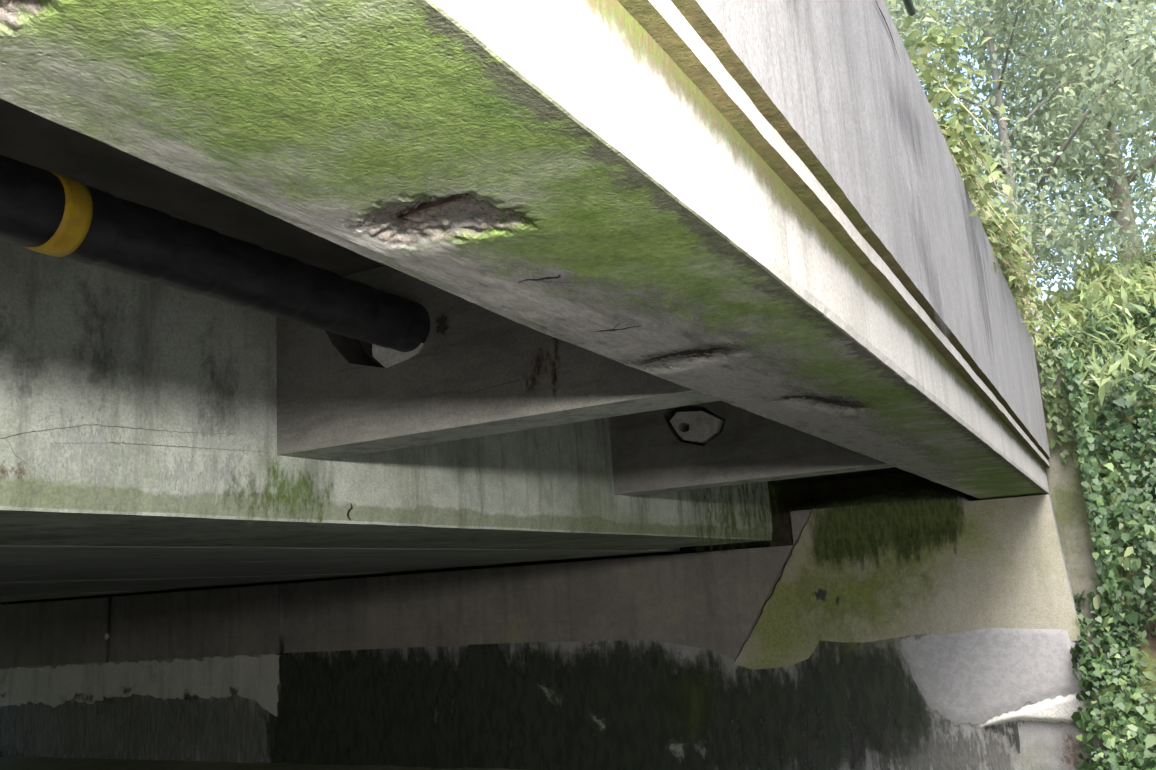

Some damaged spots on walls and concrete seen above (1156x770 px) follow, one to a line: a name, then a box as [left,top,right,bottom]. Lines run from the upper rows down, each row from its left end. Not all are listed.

spalling [0,0,54,28]
spalling [356,193,525,245]
damp [0,640,1020,770]